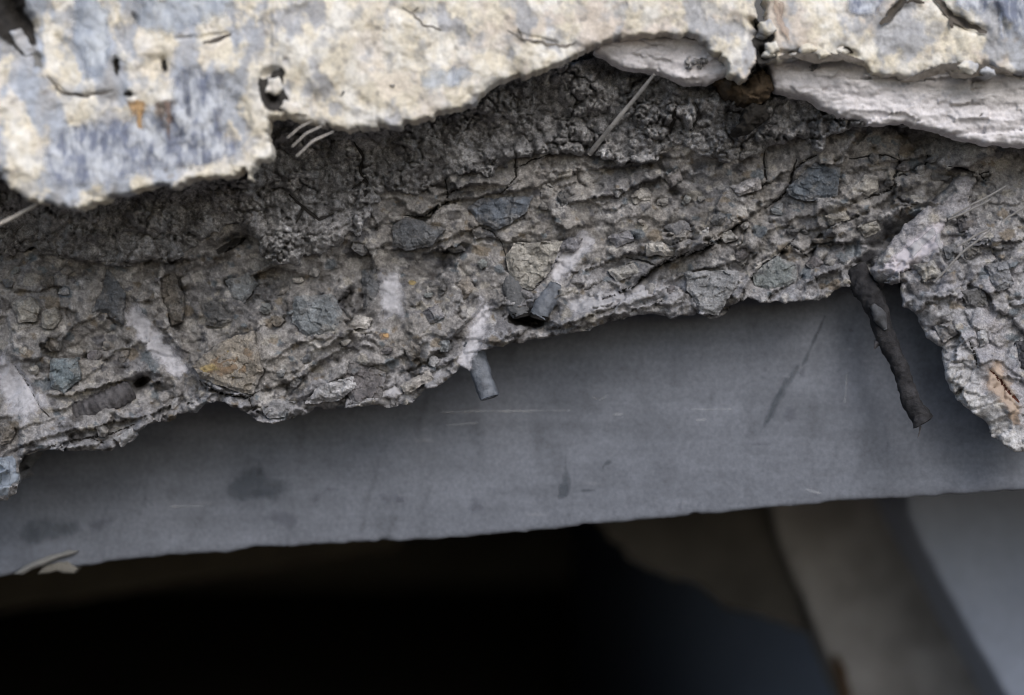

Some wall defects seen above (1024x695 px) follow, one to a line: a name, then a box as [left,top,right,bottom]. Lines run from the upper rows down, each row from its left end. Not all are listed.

spalling [258,67,307,116]
spalling [0,125,1024,501]
corrosion [848,263,933,438]
corrosion [987,361,1020,424]